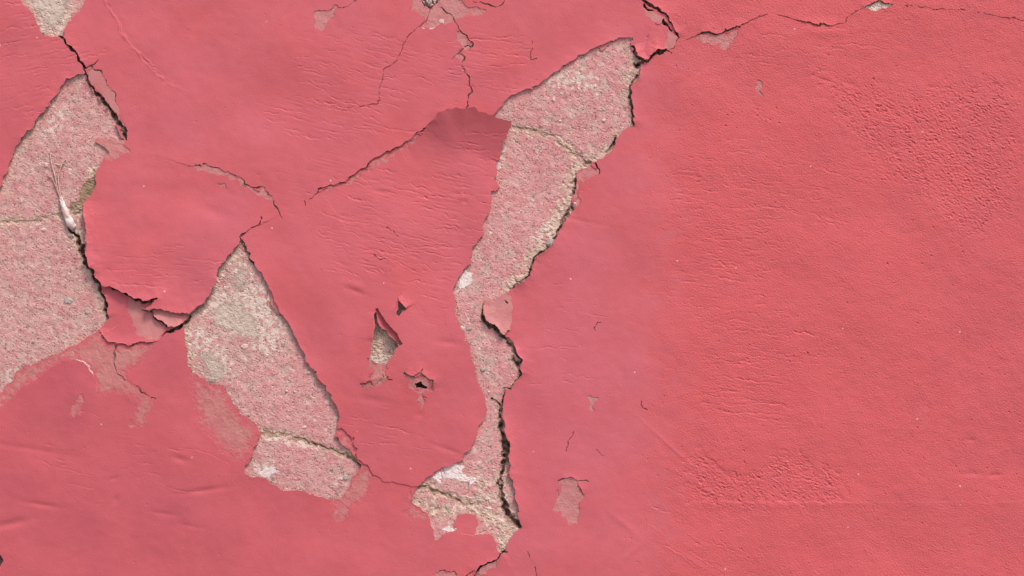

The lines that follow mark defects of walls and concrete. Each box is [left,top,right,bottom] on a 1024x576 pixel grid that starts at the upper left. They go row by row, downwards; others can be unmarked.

spalling [22,0,85,37]
crack [58,35,128,141]
crack [342,7,474,111]
crack [304,122,431,206]
spalling [0,74,155,429]
spalling [402,0,669,576]
crack [417,0,1024,576]
spalling [184,243,373,522]
peeling [360,301,434,410]